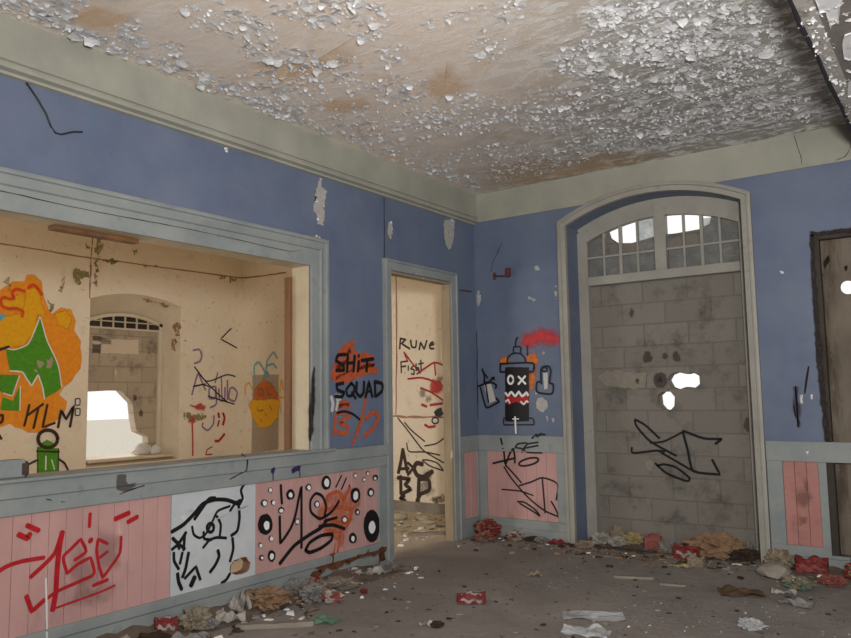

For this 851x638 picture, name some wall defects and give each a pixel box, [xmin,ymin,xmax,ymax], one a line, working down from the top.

peeling [0,0,829,189]
peeling [798,0,851,123]
peeling [313,178,327,226]
peeling [444,219,455,250]